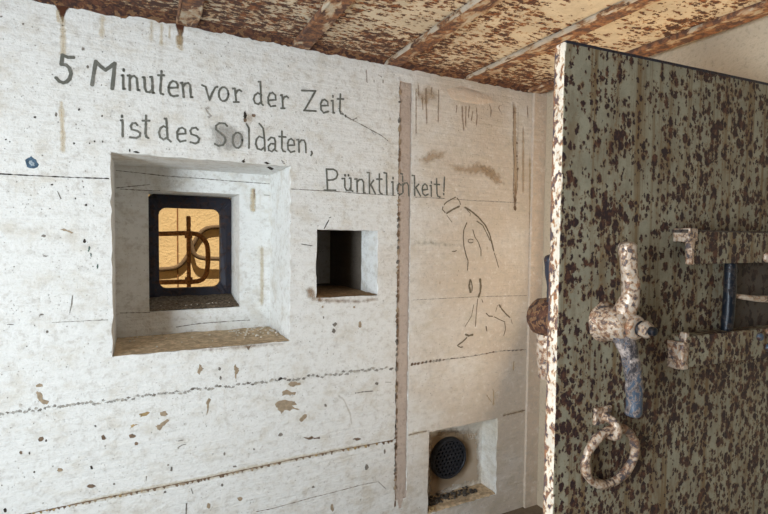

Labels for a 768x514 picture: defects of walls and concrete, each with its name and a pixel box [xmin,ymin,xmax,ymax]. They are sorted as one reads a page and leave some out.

corrosion [33,0,388,65]
corrosion [400,62,469,79]
corrosion [478,78,532,93]
peeling [0,113,401,490]